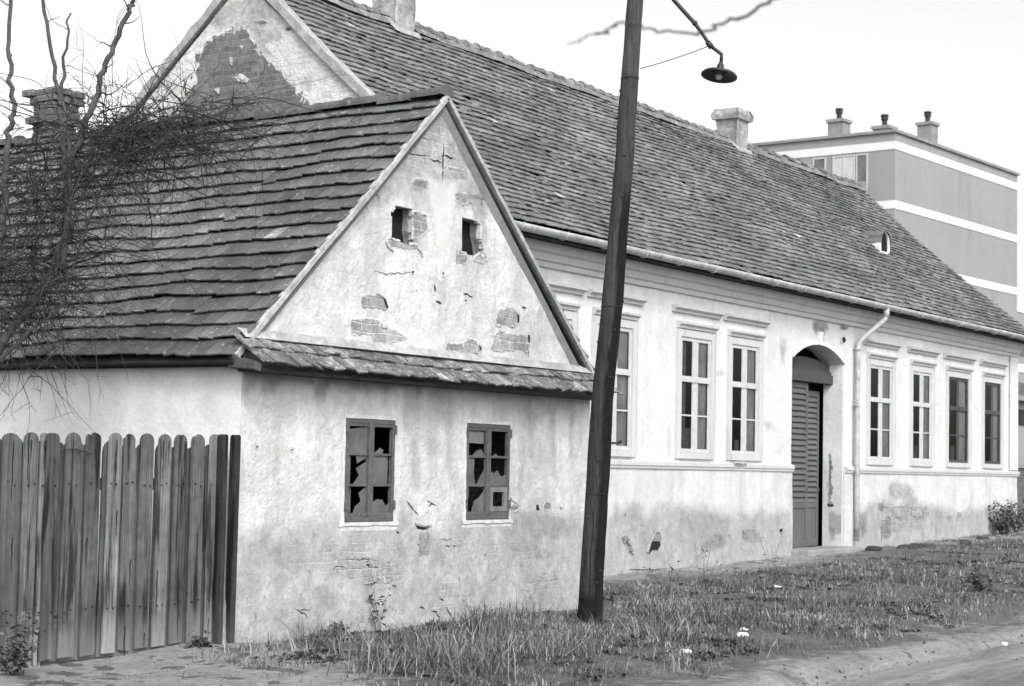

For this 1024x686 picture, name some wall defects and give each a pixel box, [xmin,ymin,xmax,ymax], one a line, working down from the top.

flaking render [172,0,309,120]
crack [410,137,456,185]
peeling [363,118,488,279]
flaking render [350,293,530,355]
flaking render [415,523,432,557]
spalling [622,532,661,556]
flaking render [878,483,929,542]